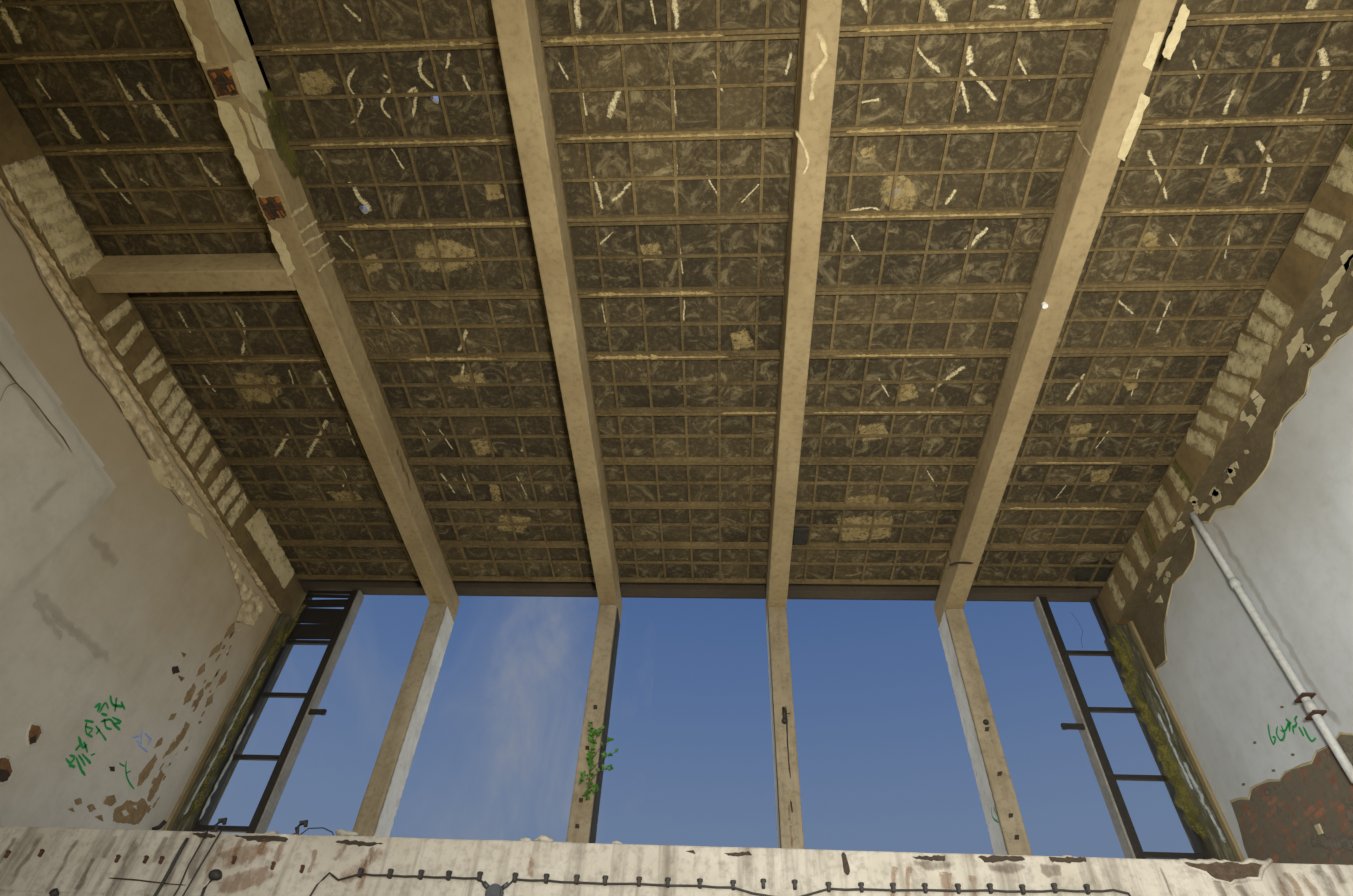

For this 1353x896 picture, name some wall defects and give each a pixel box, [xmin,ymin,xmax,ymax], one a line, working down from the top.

peeling [174,0,295,276]
peeling [1117,92,1150,161]
peeling [1142,4,1190,71]
flaking render [0,178,282,825]
flaking render [1119,220,1353,671]
flaking render [1174,732,1353,886]